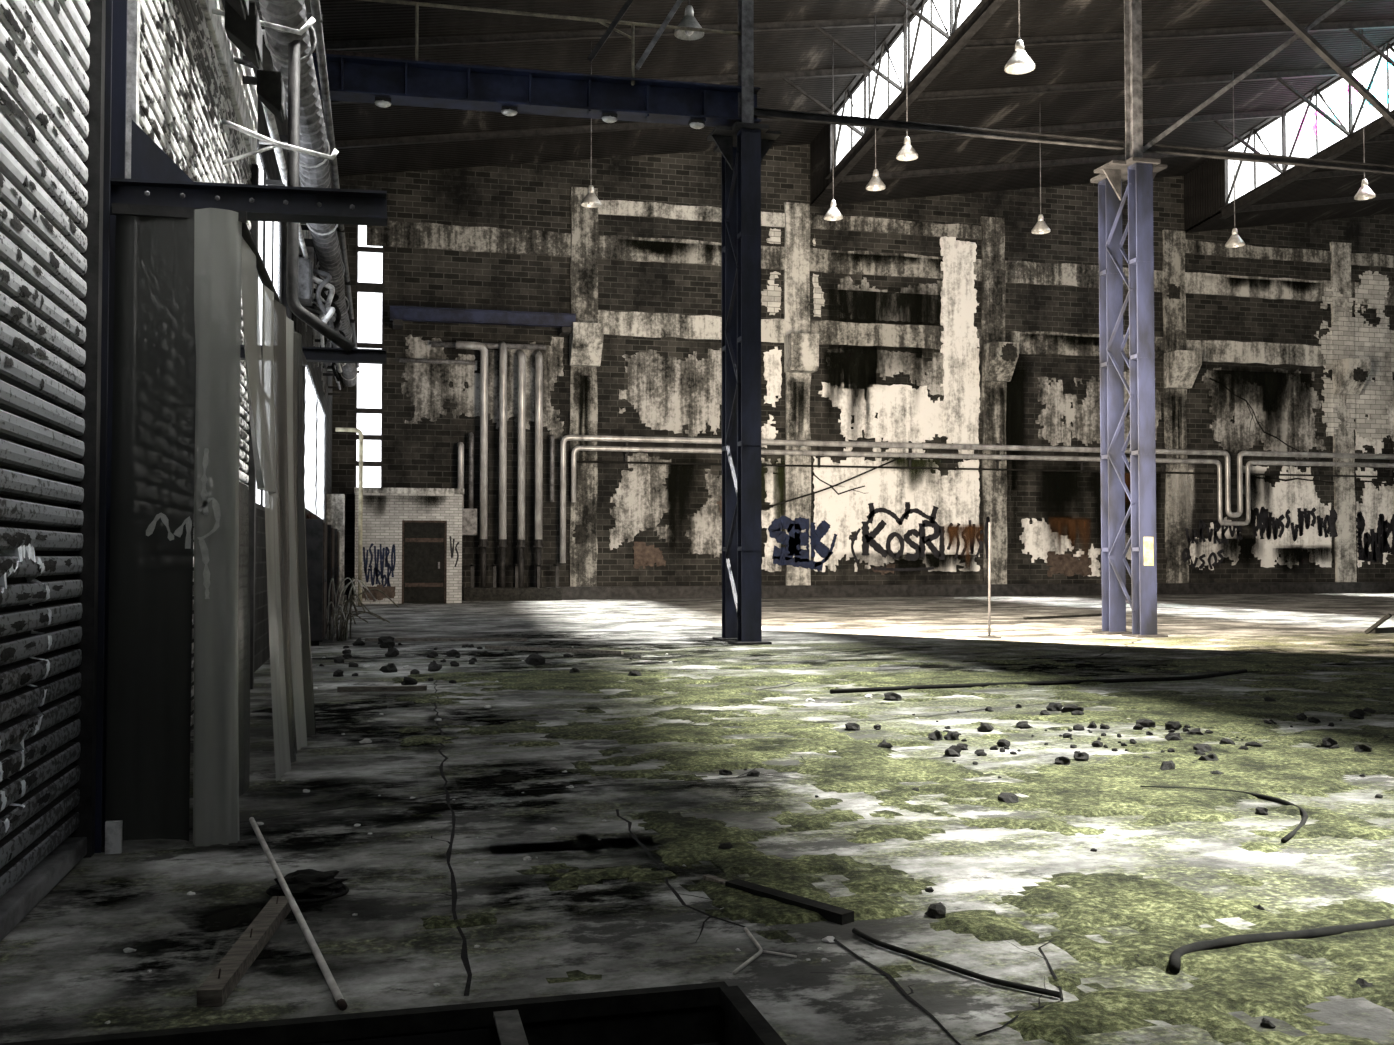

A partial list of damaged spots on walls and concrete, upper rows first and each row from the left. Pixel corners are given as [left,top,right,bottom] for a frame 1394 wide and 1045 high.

peeling [766,228,781,244]
peeling [761,271,781,315]
peeling [619,348,722,438]
peeling [812,236,980,575]
peeling [1189,271,1394,570]
peeling [0,532,47,574]
peeling [573,453,722,569]
peeling [1019,518,1101,577]
peeling [0,559,72,662]
crack [1054,640,1155,661]
crack [239,680,817,996]
crack [810,939,1064,1045]